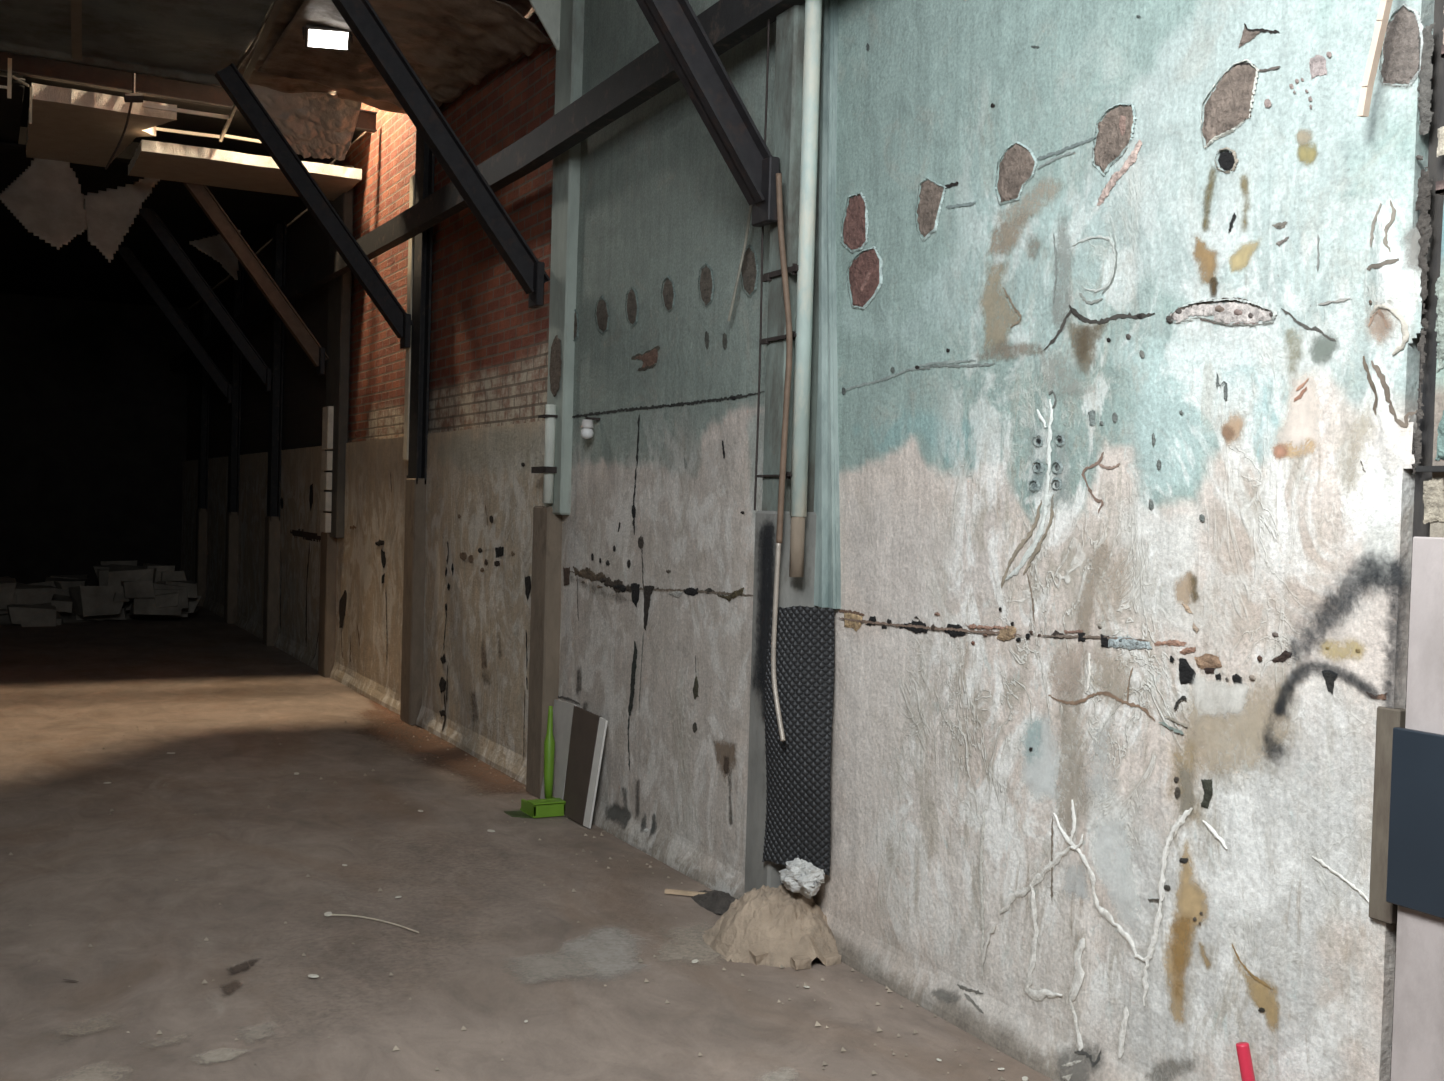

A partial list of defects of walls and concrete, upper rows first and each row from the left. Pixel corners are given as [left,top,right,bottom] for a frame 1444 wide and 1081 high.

spalling [1201,23,1281,149]
peeling [1289,51,1332,109]
spalling [995,103,1142,206]
spalling [573,287,639,341]
spalling [840,192,883,311]
spalling [915,177,976,242]
crack [1044,305,1155,358]
spalling [1379,3,1444,524]
crack [572,391,765,770]
damp [1078,545,1123,634]
damp [932,653,1287,1081]
damp [1312,856,1369,903]